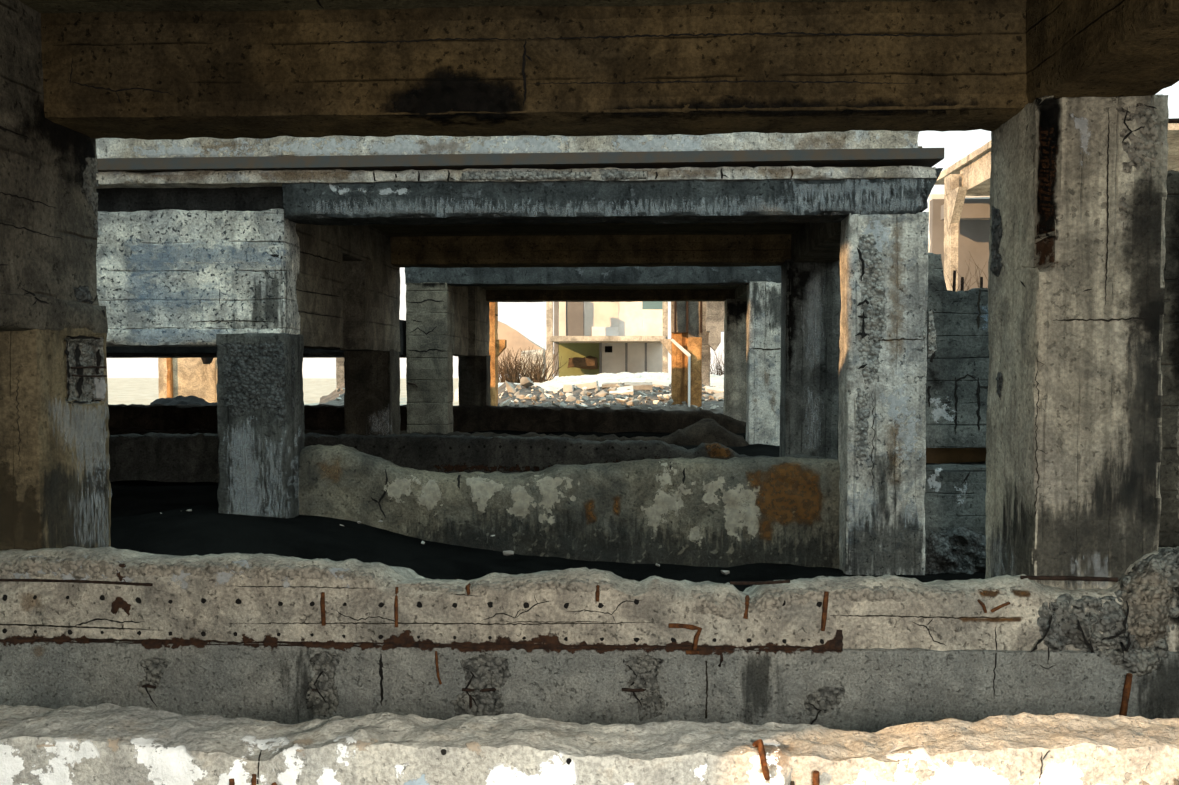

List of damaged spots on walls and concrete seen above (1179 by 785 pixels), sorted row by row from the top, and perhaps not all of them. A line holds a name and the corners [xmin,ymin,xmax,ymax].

crack [1053,104,1157,322]
crack [1034,350,1046,515]
leakage [0,463,132,582]
peeling [640,460,761,542]
rust [747,462,823,541]
rust [1,633,90,646]
crack [0,618,148,630]
rust [141,637,211,649]
rust [298,630,842,655]
peeling [0,740,100,785]
peeling [130,735,304,785]
peeling [740,739,784,785]